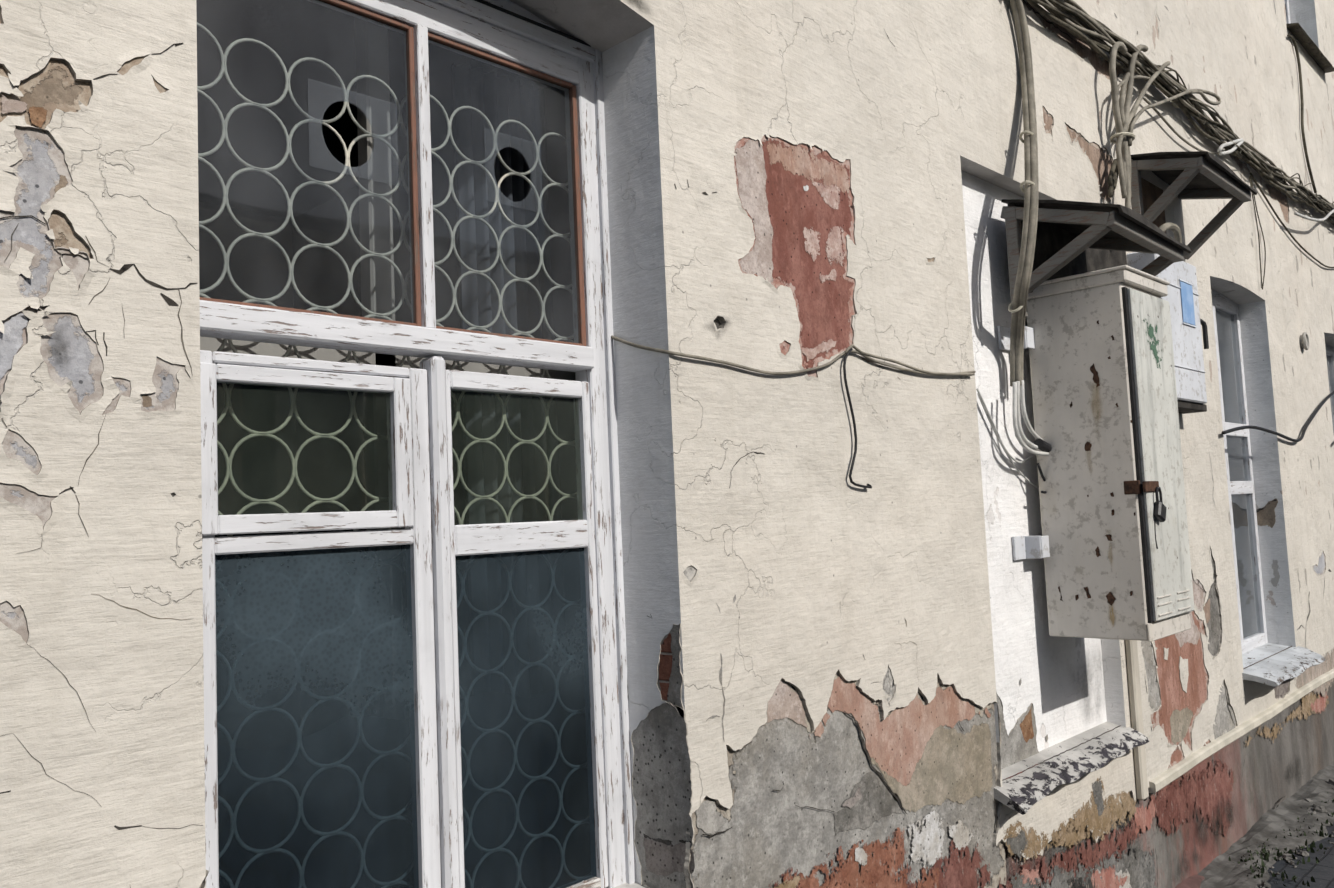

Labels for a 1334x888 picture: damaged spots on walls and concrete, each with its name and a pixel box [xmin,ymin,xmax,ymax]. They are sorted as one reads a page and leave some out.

peeling [0,43,191,553]
crack [86,237,197,376]
peeling [733,134,857,377]
crack [94,594,187,620]
crack [114,823,194,831]
flaking render [631,547,1334,888]